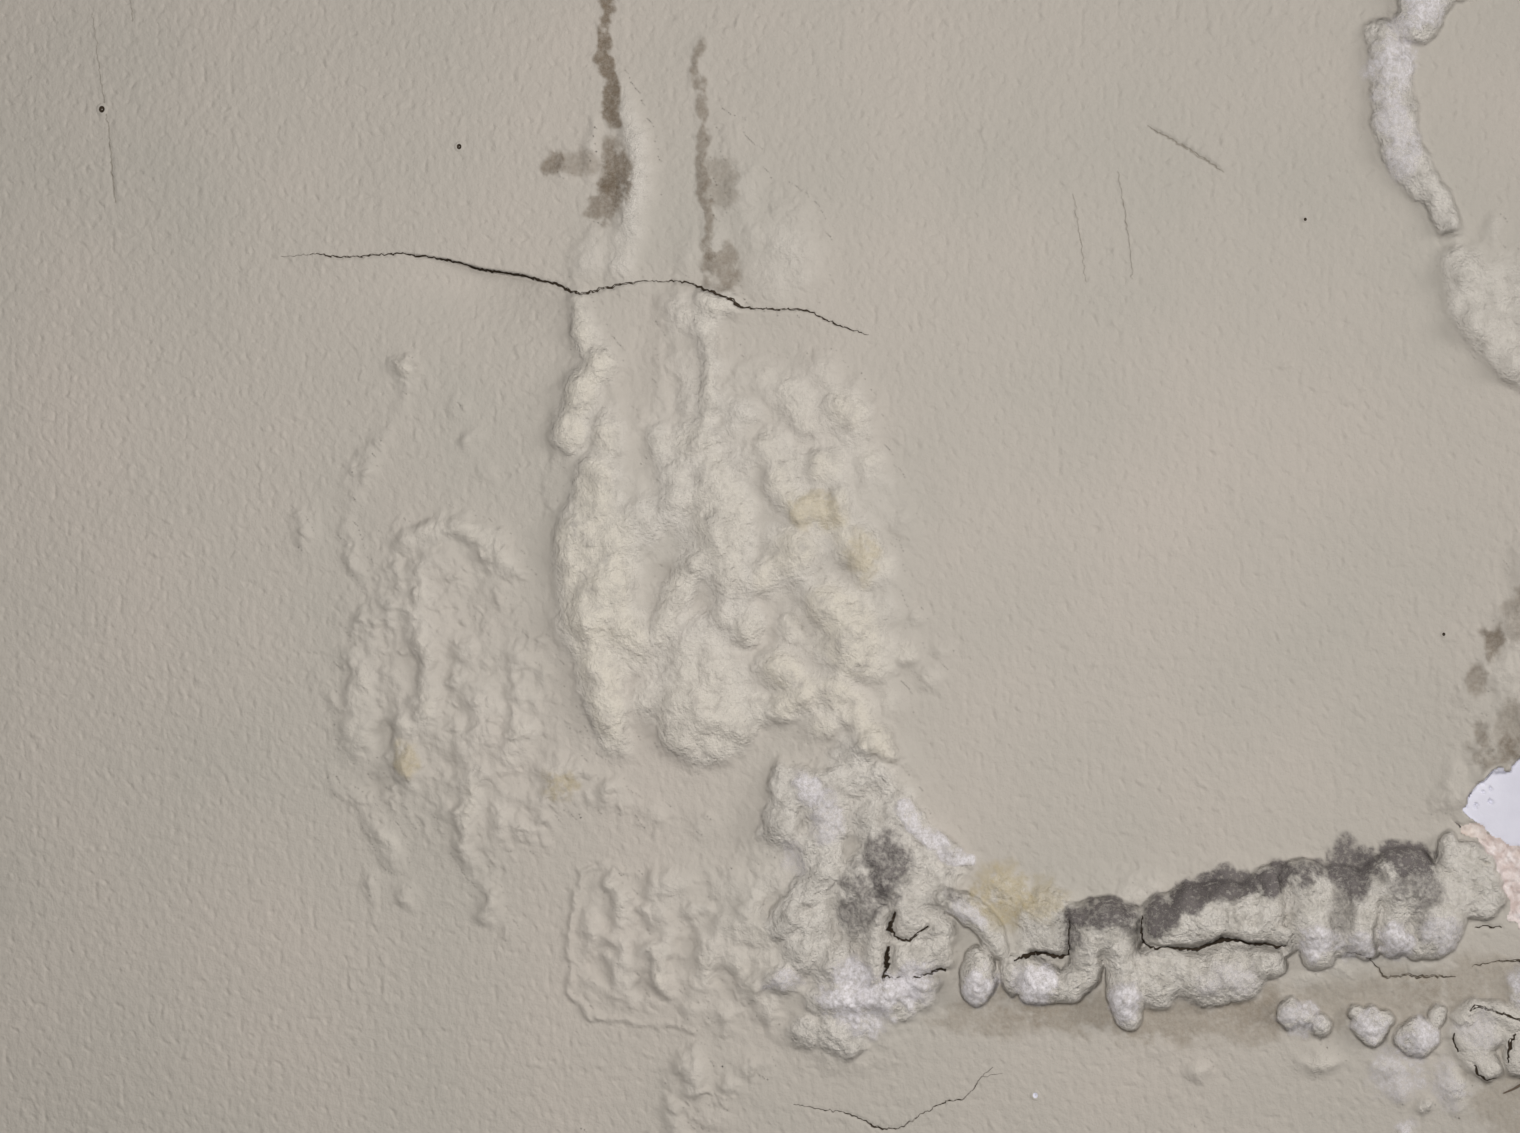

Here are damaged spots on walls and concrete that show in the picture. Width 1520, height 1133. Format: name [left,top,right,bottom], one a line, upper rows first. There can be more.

crack [282,252,869,335]
peeling [1429,538,1520,929]
crack [1014,920,1070,961]
crack [1140,915,1286,951]